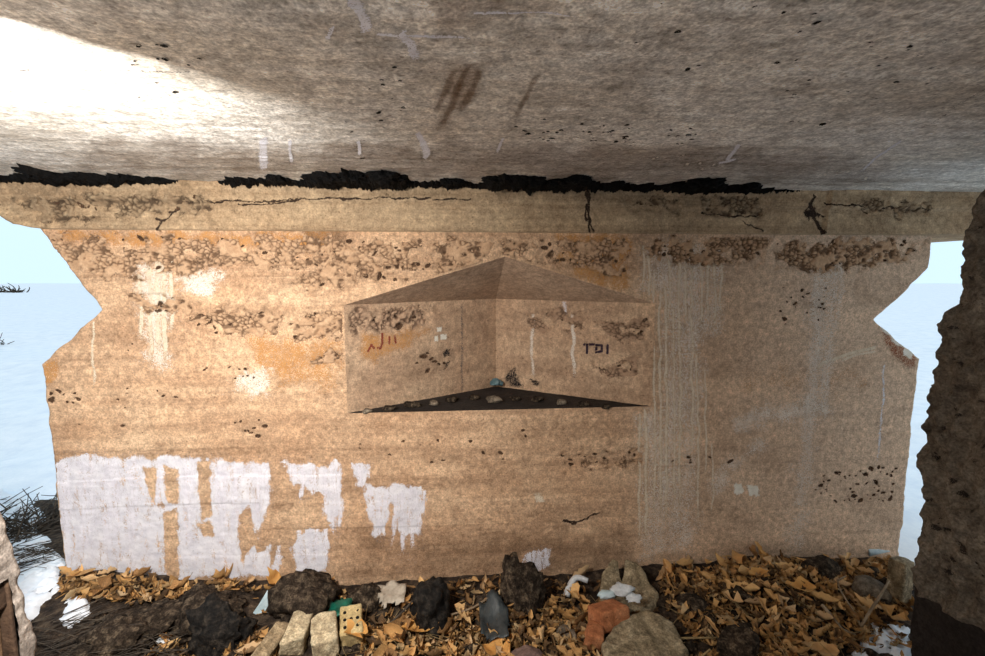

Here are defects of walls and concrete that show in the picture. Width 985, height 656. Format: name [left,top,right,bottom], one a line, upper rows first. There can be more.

crack [584,190,595,233]
crack [804,195,895,235]
leakage [630,234,848,562]